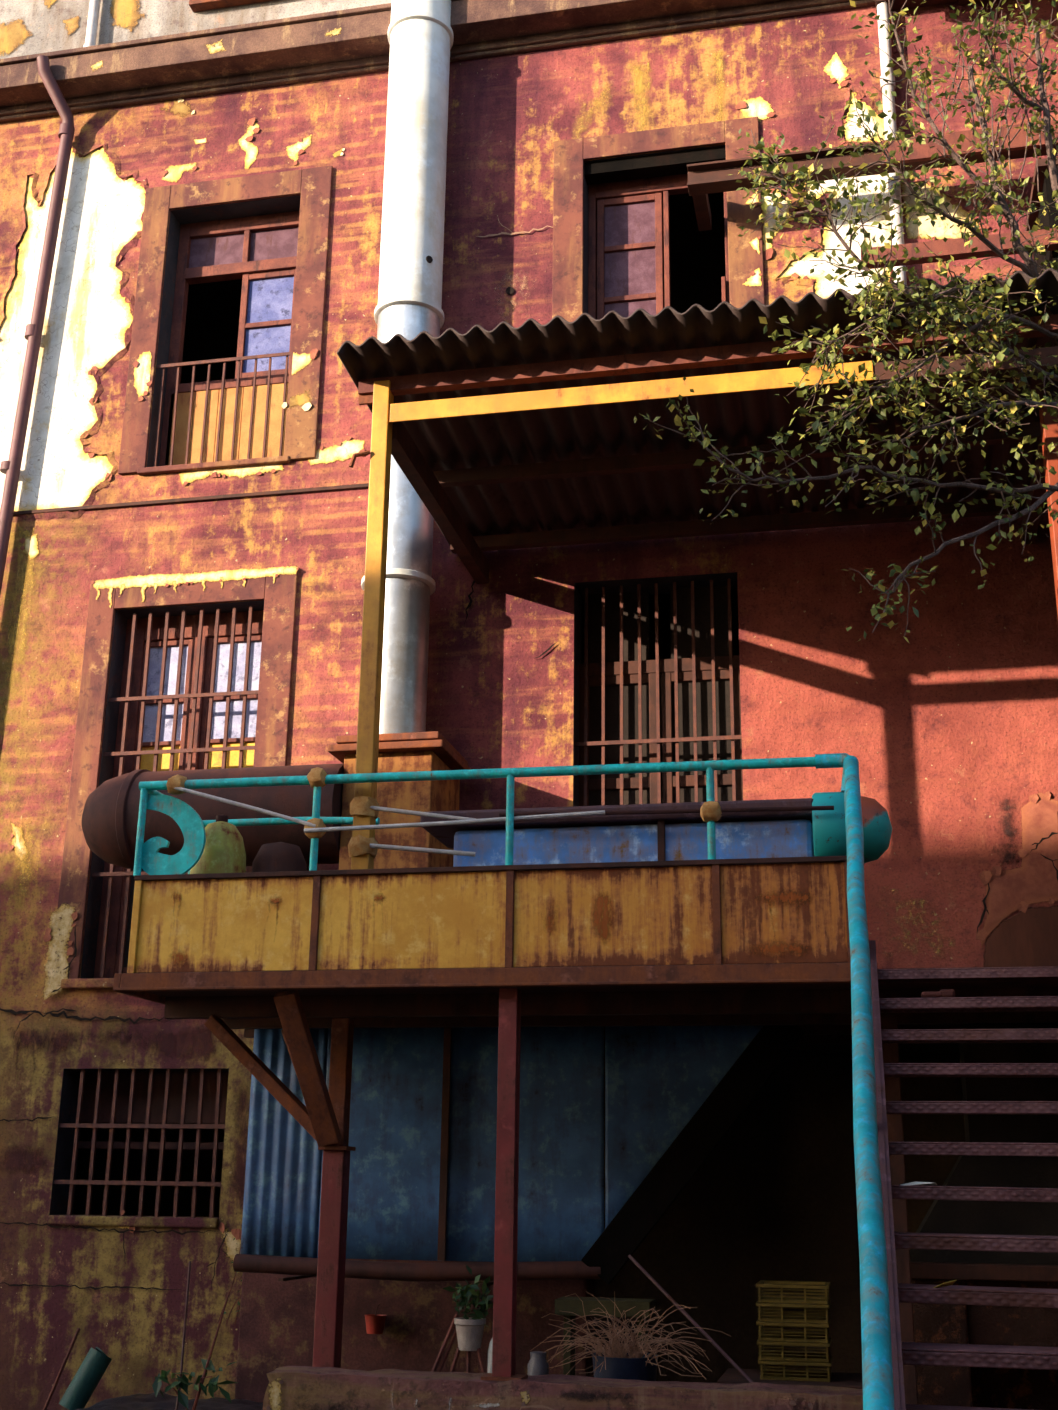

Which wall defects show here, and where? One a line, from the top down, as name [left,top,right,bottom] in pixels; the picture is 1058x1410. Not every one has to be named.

peeling [238,117,260,169]
peeling [735,96,775,122]
peeling [823,52,885,146]
peeling [743,172,991,298]
peeling [0,142,197,560]
crack [1030,832,1058,880]
spalling [42,903,78,1000]
crack [0,926,172,1031]
rust [593,894,615,940]
crack [977,883,990,933]
damp [10,1028,78,1052]
damp [231,1089,250,1209]